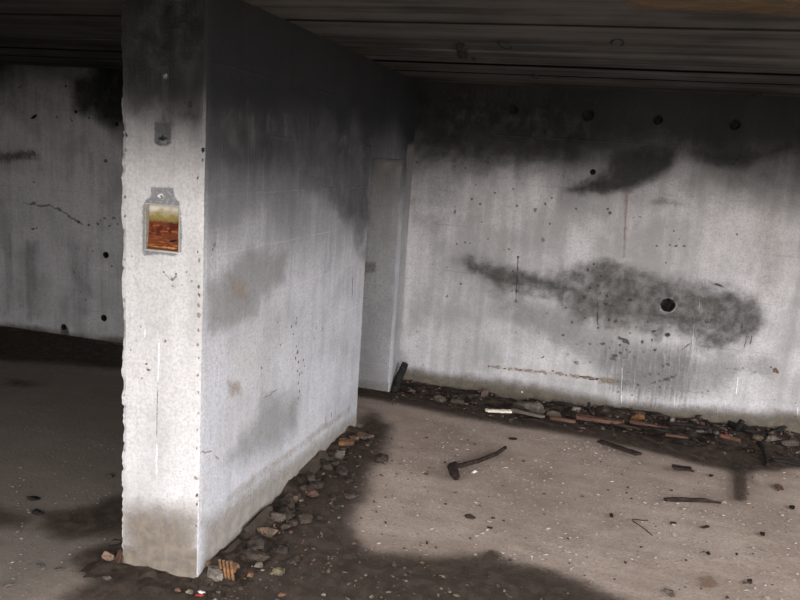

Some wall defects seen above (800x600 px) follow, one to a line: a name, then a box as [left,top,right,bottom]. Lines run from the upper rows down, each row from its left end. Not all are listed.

damp [65,71,124,126]
crack [26,202,118,227]
damp [467,256,759,347]
corrosion [488,365,629,384]